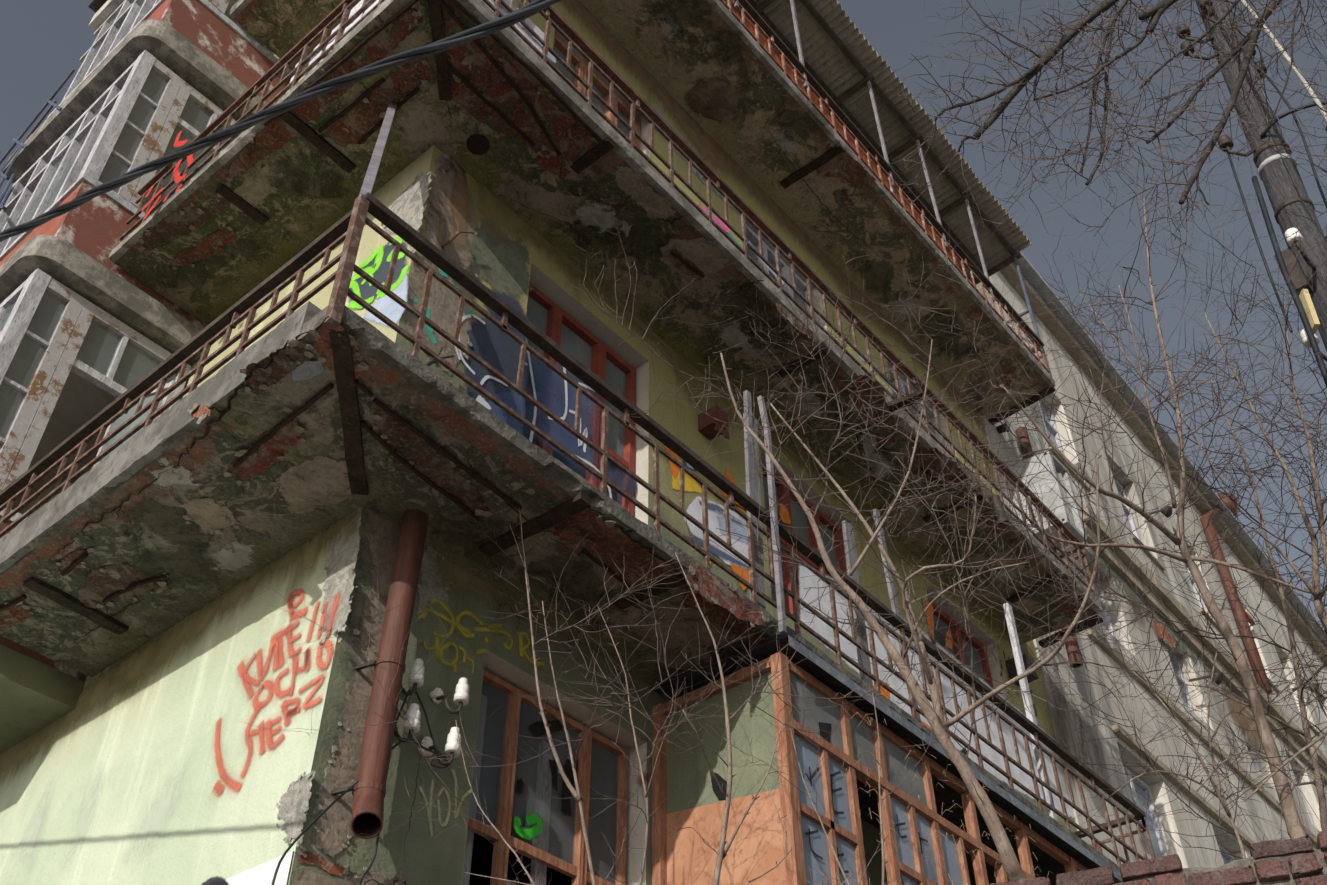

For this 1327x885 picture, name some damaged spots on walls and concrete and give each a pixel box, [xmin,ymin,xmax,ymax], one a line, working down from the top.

spalling [139,0,602,376]
water stain [563,0,983,429]
crack [49,316,329,559]
peeling [178,497,241,535]
peeling [223,325,522,885]